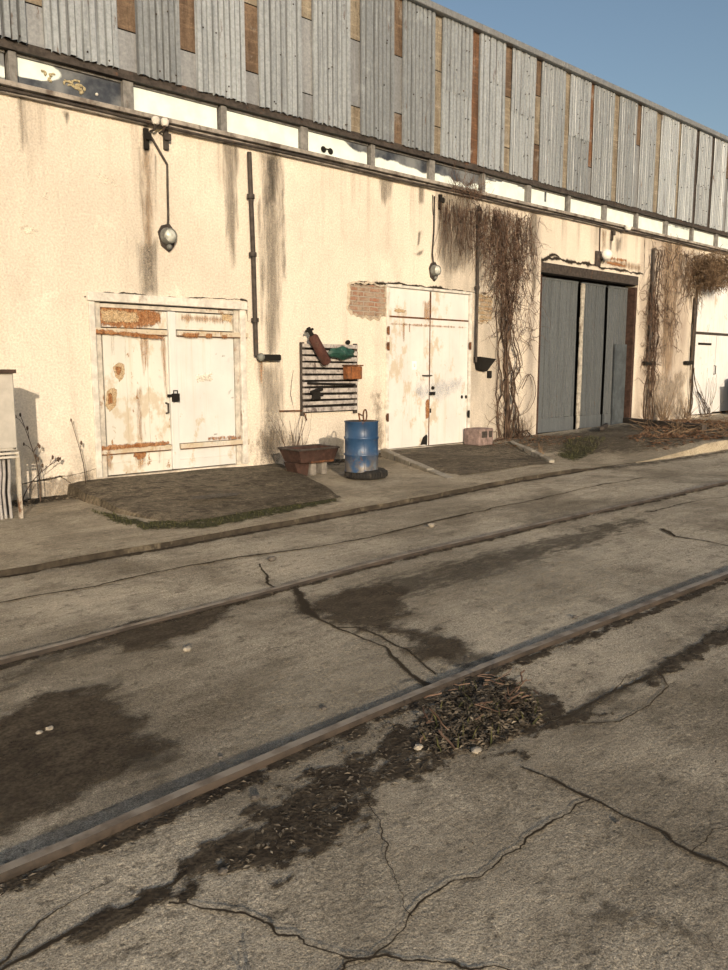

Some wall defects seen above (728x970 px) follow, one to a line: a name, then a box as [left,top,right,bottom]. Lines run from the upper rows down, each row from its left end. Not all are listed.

corrosion [105,363,125,412]
damp [141,150,156,292]
corrosion [96,307,240,369]
corrosion [101,422,243,467]
damp [225,144,237,254]
damp [261,155,279,354]
damp [263,369,280,461]
spalling [346,281,387,321]
corrosion [389,292,469,445]
damp [0,684,179,835]
crack [117,766,728,970]
crack [0,883,108,970]